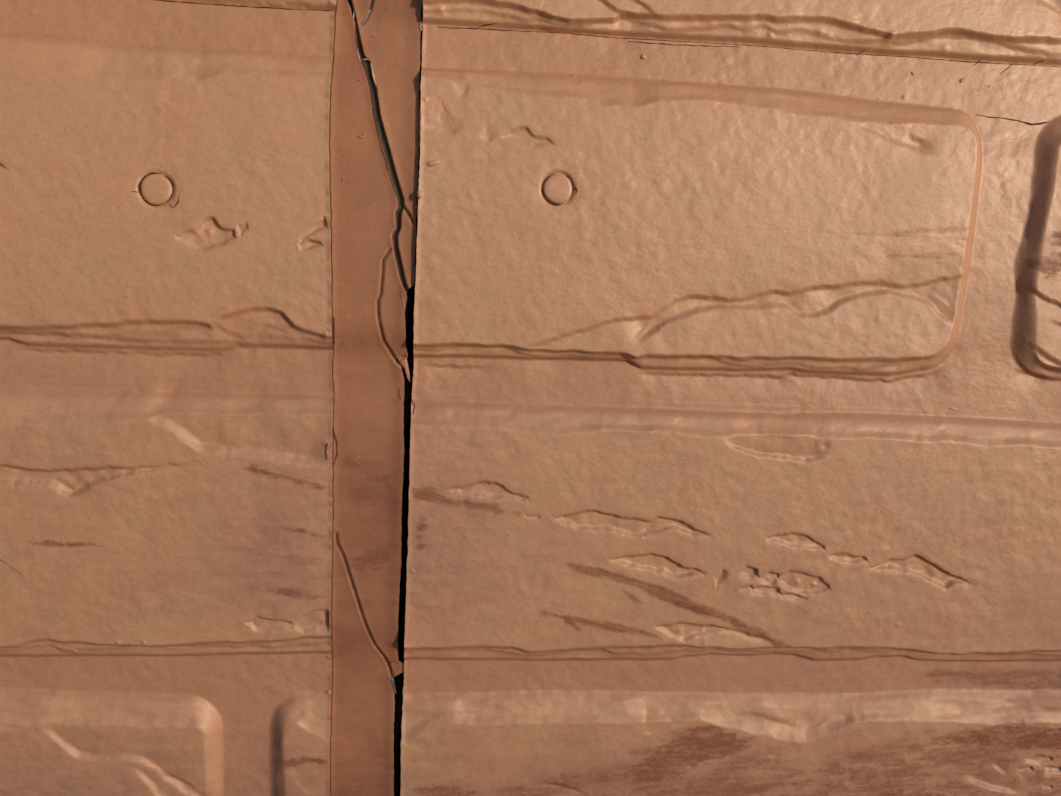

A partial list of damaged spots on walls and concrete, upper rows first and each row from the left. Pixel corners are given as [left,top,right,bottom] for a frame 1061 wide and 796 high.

crack [441,0,1061,75]
crack [842,116,949,164]
crack [976,114,1049,125]
crack [542,173,578,205]
crack [515,272,974,356]
crack [1010,277,1061,331]
crack [131,0,423,796]
crack [626,697,696,740]